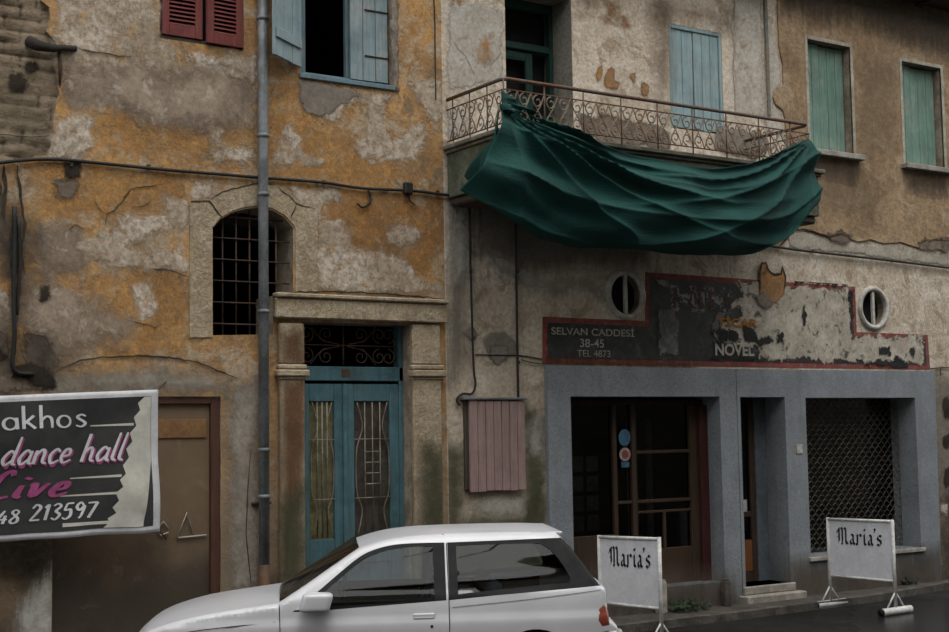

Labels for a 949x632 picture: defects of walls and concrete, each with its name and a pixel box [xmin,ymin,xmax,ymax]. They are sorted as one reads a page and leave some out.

flaking render [596,66,620,89]
flaking render [630,73,649,95]
peeling [268,0,503,294]
crack [67,184,160,231]
peeling [0,0,258,393]
peeling [658,309,679,356]
peeling [713,264,925,368]
crack [57,355,240,380]
damp [794,378,949,596]
damp [607,605,655,617]
damp [667,578,721,606]